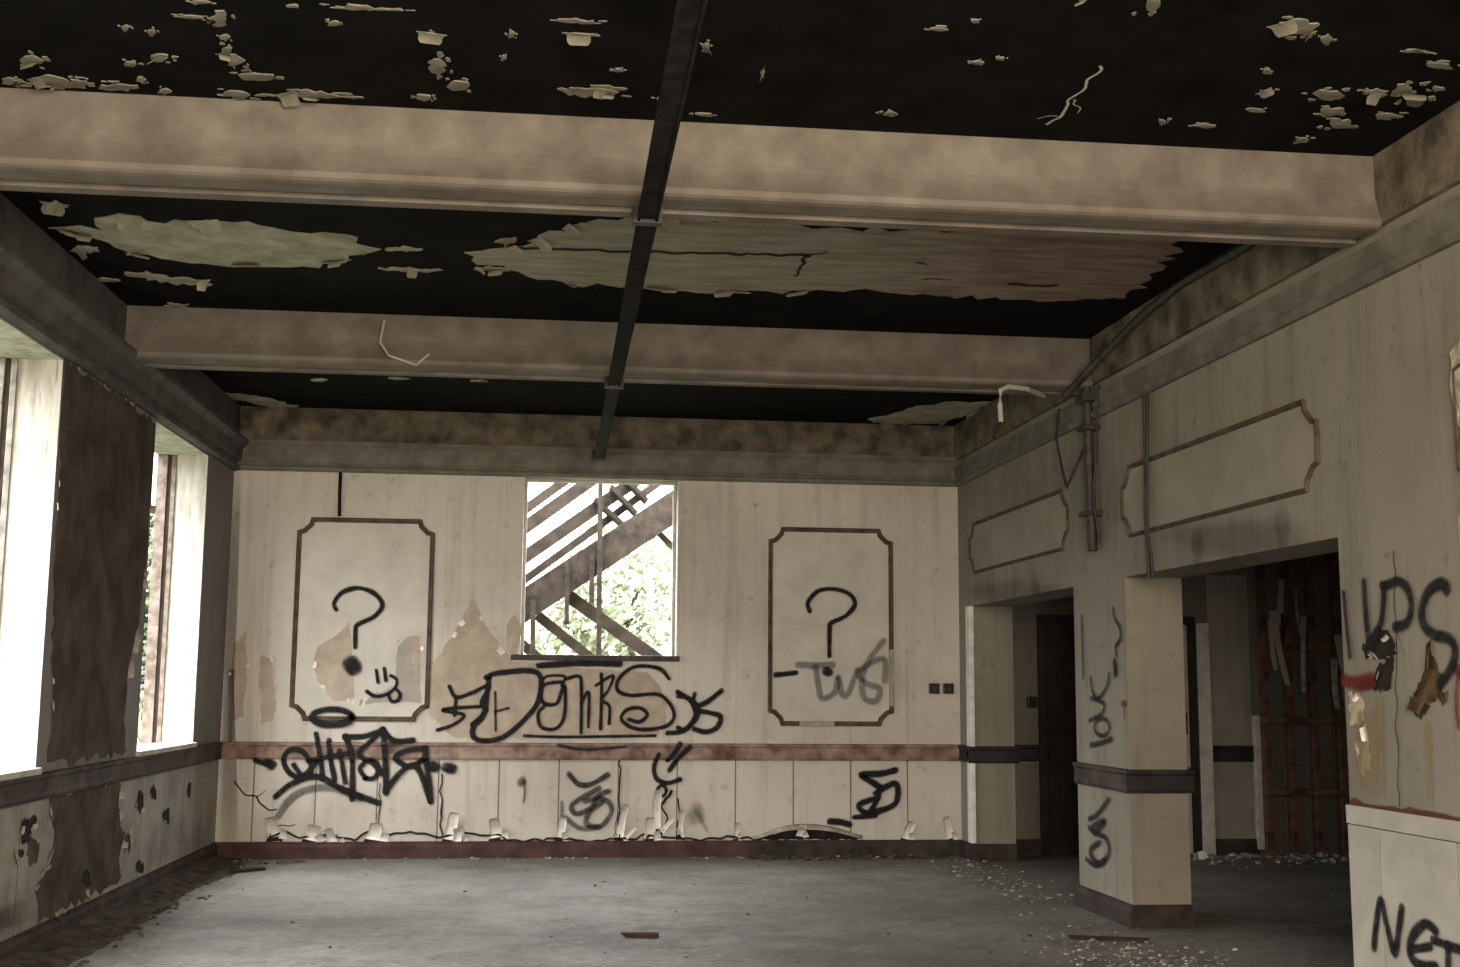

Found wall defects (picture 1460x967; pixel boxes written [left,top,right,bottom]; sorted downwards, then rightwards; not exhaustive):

peeling [2,24,179,96]
peeling [171,0,364,107]
peeling [410,30,471,102]
peeling [550,18,607,46]
peeling [557,67,632,100]
peeling [1267,16,1337,46]
peeling [1294,49,1460,144]
peeling [39,200,443,308]
peeling [464,217,635,288]
peeling [643,219,1183,302]
peeling [312,599,666,740]
flaking render [1348,630,1396,776]